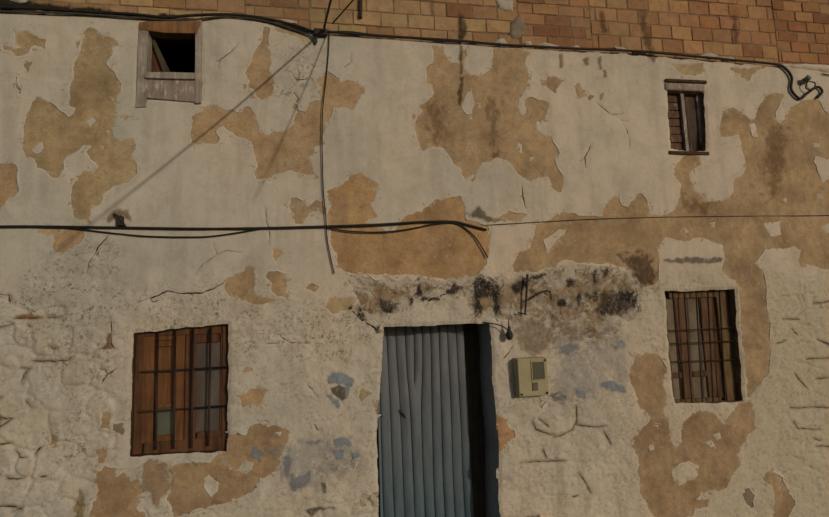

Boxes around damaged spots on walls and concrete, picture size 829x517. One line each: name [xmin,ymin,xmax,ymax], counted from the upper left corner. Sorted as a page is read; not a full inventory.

peeling [22,27,139,220]
peeling [189,26,365,181]
water stain [458,16,466,104]
peeling [413,45,564,194]
peeling [0,162,21,208]
peeling [37,228,86,253]
crack [140,244,241,302]
peeling [287,93,829,517]
peeling [101,412,125,435]
peeling [88,449,147,517]
peeling [164,422,289,517]